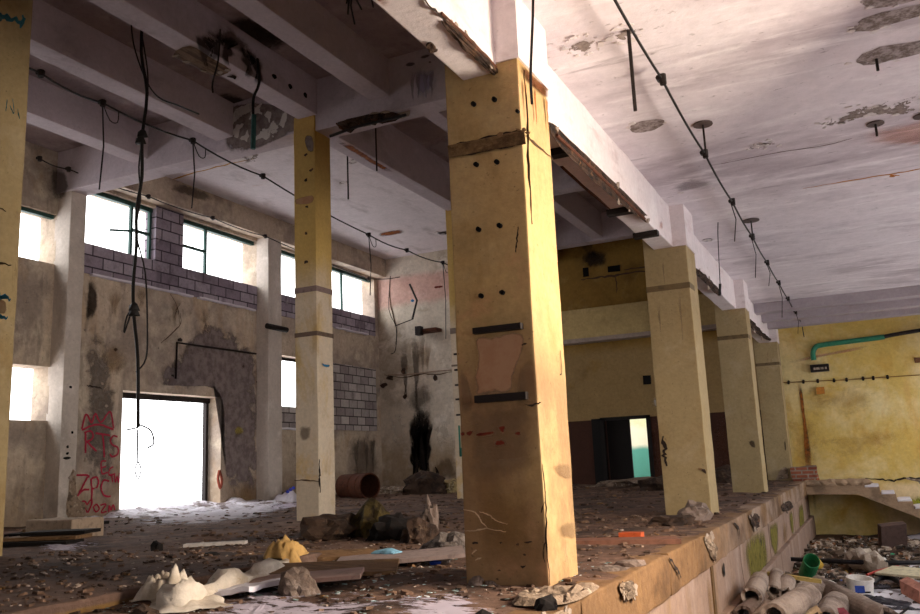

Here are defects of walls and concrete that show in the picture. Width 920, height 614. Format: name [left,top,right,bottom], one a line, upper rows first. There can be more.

spalling [440,12,498,75]
peeling [227,102,295,163]
spalling [329,110,410,138]
peeling [814,98,920,129]
peeling [475,333,523,394]
leakage [410,422,433,474]
crack [865,475,920,483]